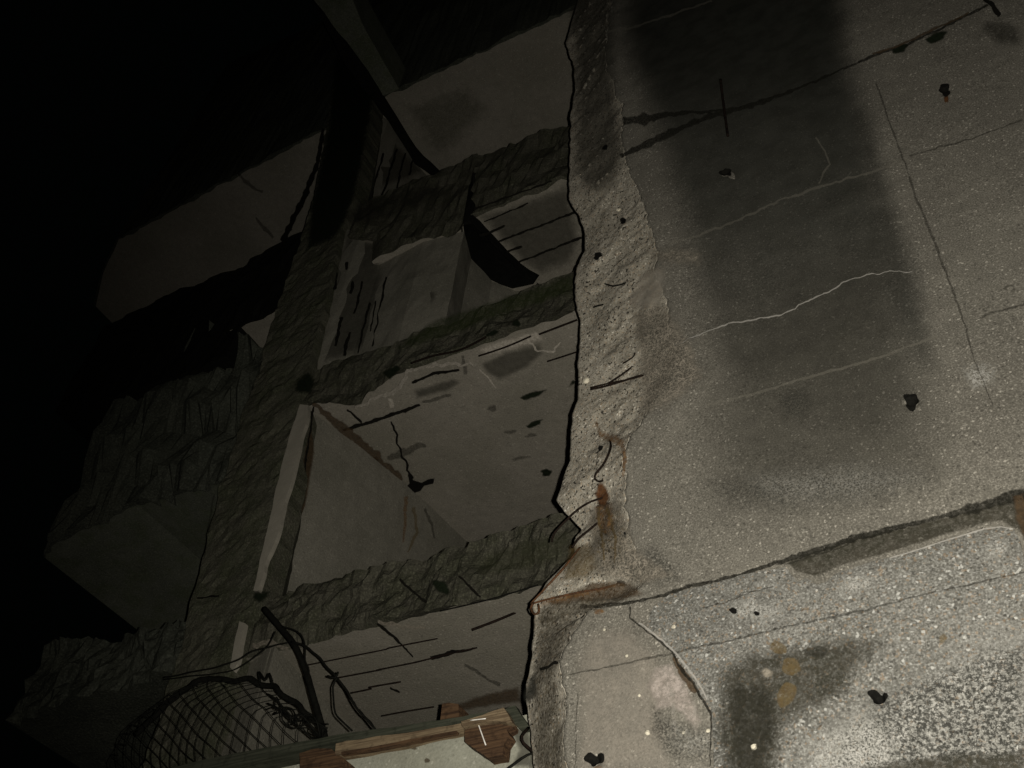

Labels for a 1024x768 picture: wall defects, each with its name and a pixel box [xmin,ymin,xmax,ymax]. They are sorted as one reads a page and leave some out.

water stain [635,0,877,253]
crack [620,0,1001,158]
crack [675,270,912,345]
crack [347,404,420,479]
spalling [338,0,698,768]
rust [596,484,612,532]
crack [540,661,558,671]
water stain [722,645,868,768]
crack [580,490,1024,766]